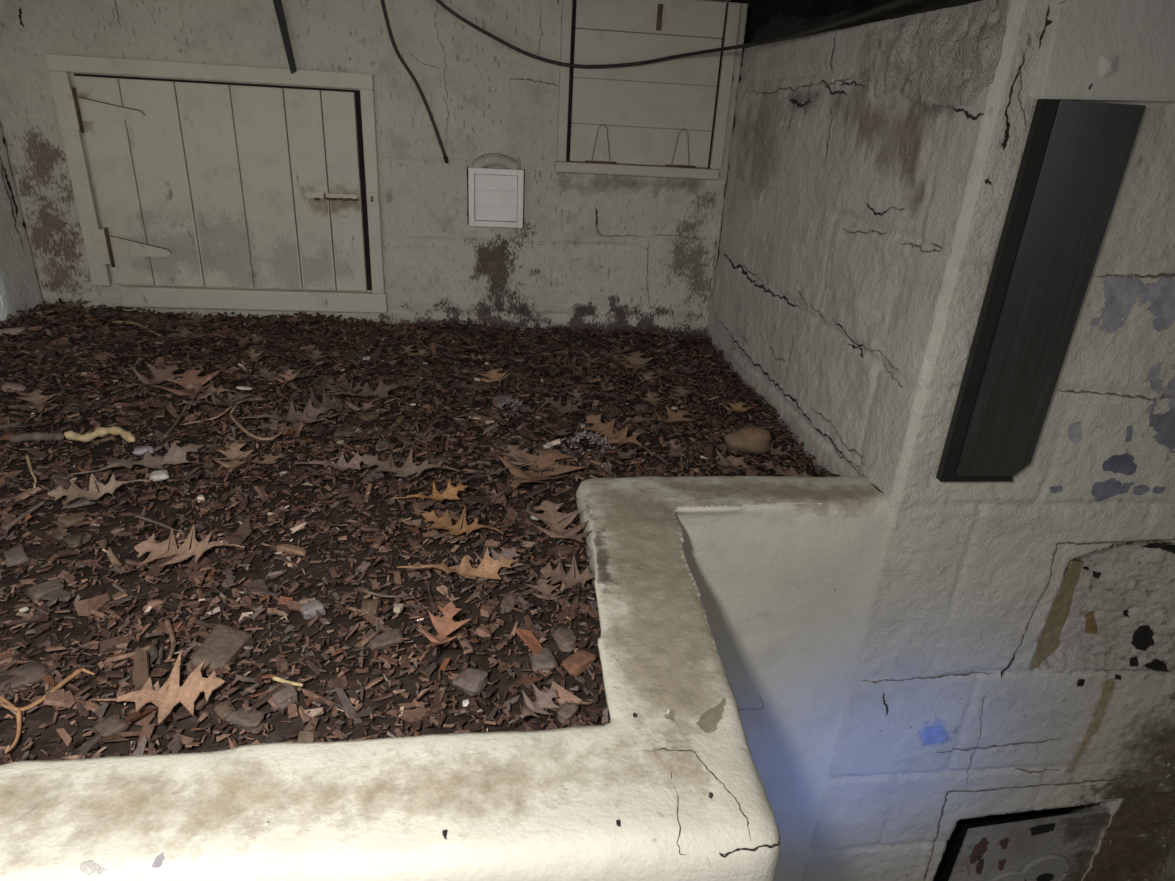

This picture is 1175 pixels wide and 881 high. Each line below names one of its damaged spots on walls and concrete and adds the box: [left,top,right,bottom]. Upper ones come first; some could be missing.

crack [732,36,866,162]
crack [952,0,1065,150]
crack [0,148,25,254]
leakage [10,119,94,300]
leakage [378,191,718,337]
crack [595,205,903,493]
peeling [1090,273,1175,333]
peeling [1092,362,1175,502]
crack [642,748,781,858]
leakage [1087,789,1175,881]